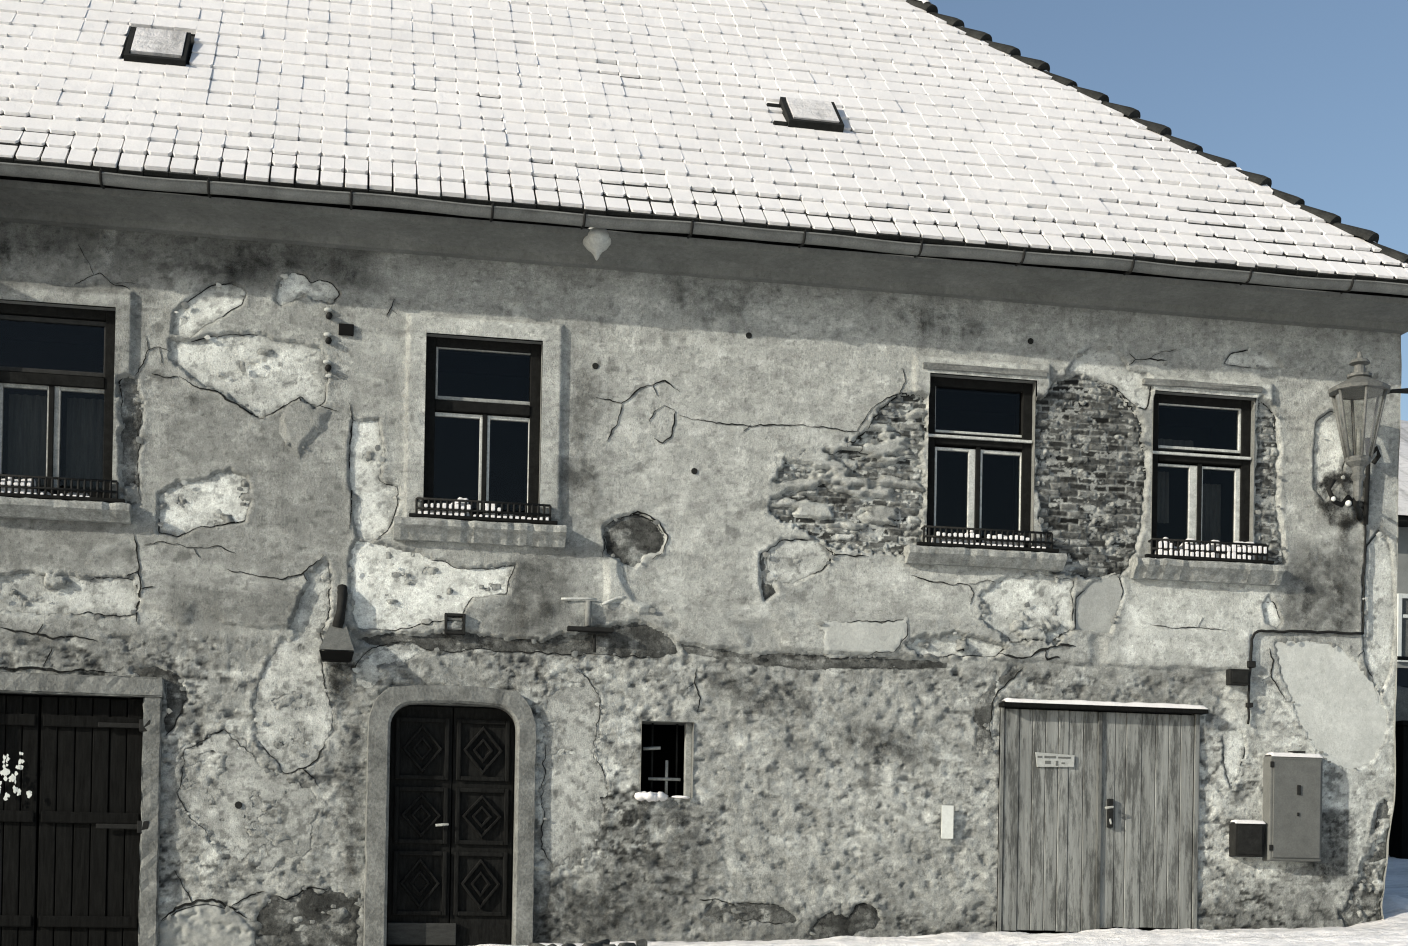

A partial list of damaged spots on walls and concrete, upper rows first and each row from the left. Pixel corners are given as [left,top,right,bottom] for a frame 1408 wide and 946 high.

spalling [118,377,143,505]
peeling [157,470,250,537]
peeling [170,282,331,418]
crack [596,371,907,452]
flaking render [1254,400,1287,565]
crack [0,624,115,673]
crack [127,533,324,622]
flaking render [348,346,1151,870]
crack [911,575,996,604]
crack [957,574,1123,661]
peeling [1263,530,1394,770]
peeling [176,561,332,872]